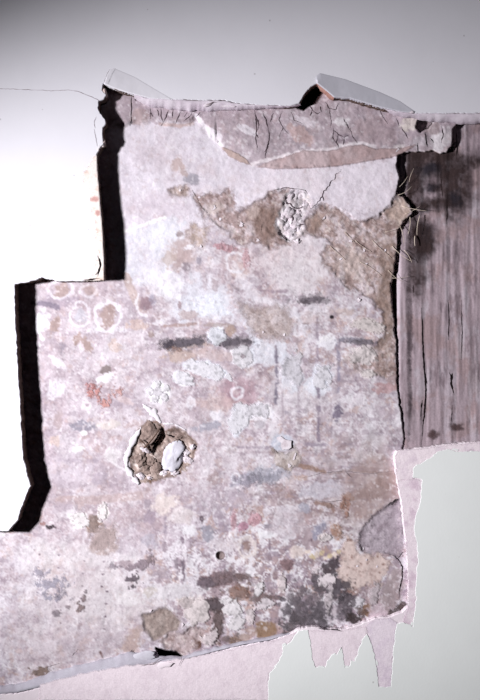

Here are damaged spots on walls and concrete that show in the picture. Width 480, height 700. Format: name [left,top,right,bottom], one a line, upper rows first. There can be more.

crack [254,103,356,155]
crack [380,111,457,155]
crack [276,173,337,207]
damp [407,150,480,301]
spalling [168,173,425,379]
spalling [123,358,232,484]
peeling [0,597,294,700]
peeling [220,582,275,630]
damp [197,556,367,646]